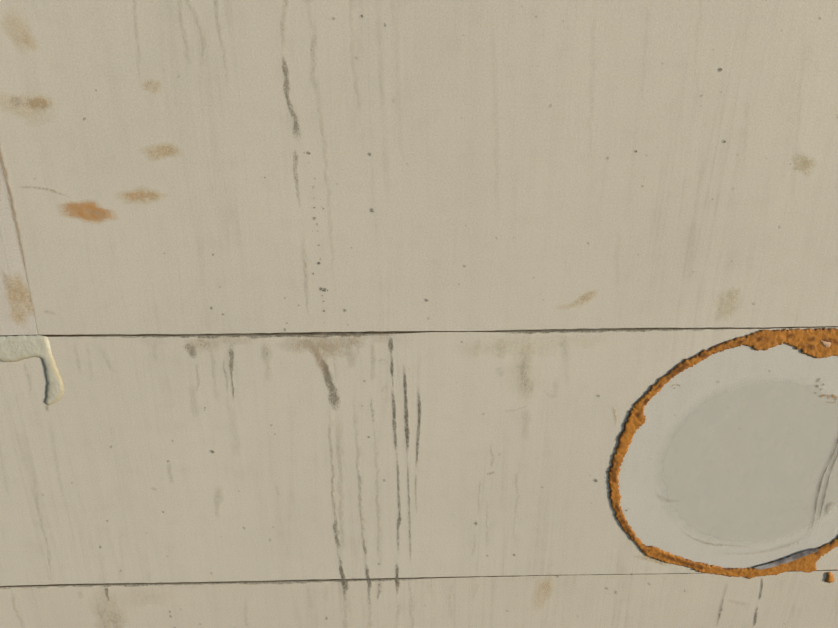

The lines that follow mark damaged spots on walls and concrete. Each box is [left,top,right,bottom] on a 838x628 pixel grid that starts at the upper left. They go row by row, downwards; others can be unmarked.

rust [66,203,111,221]
damp [312,347,340,404]
damp [392,375,421,460]
crack [812,439,838,526]